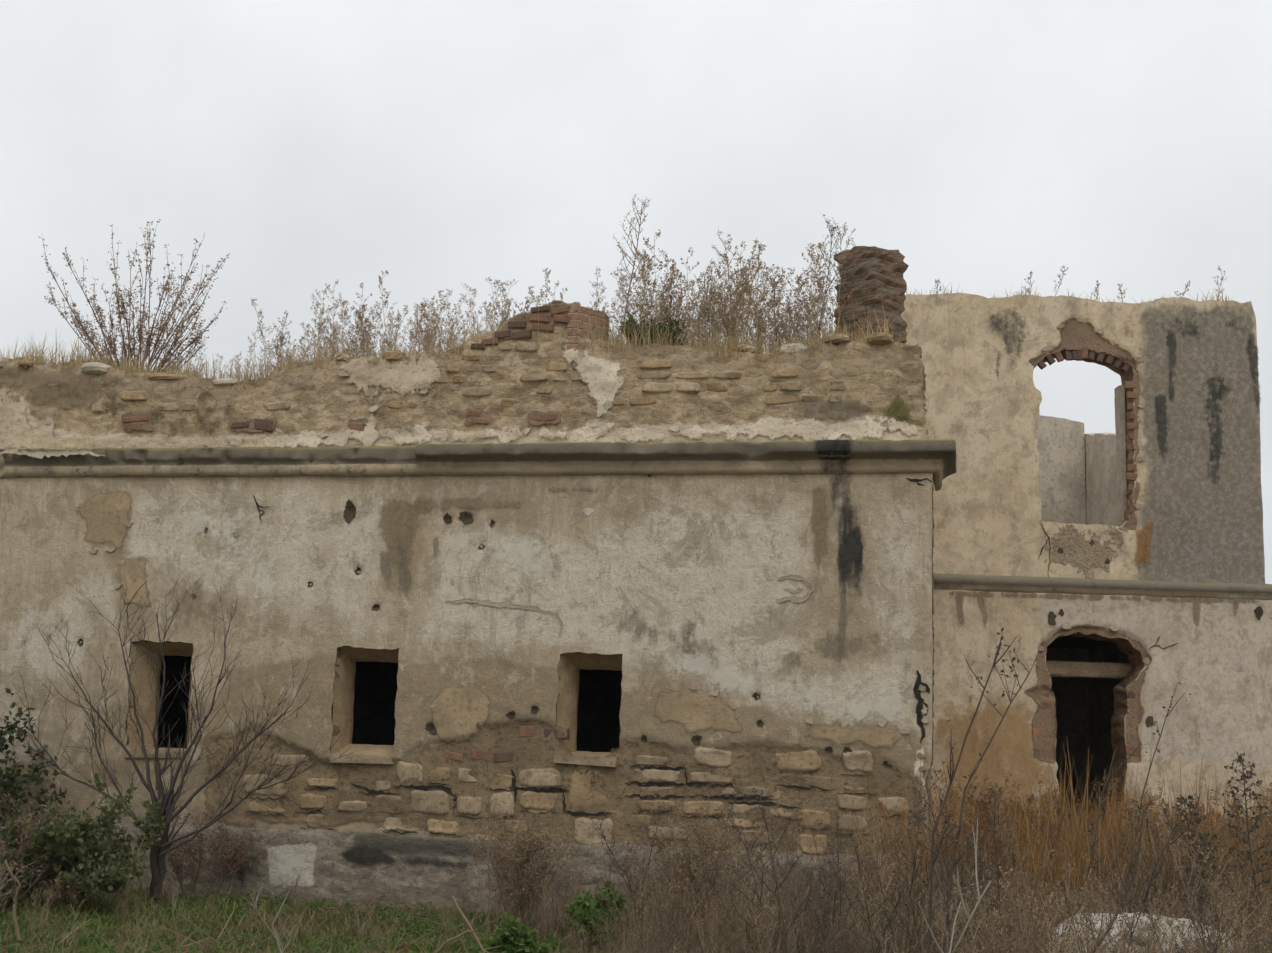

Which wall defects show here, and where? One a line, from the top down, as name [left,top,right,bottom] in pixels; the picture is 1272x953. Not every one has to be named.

flaking render [228,417,276,433]
flaking render [348,405,379,431]
flaking render [522,411,561,435]
flaking render [1029,318,1146,579]
water stain [1155,320,1197,454]
water stain [1207,378,1229,479]
water stain [1248,334,1261,404]
water stain [811,440,863,657]
spalling [430,681,514,763]
crack [913,670,930,744]
flaking render [1025,624,1152,763]
spalling [911,745,927,860]